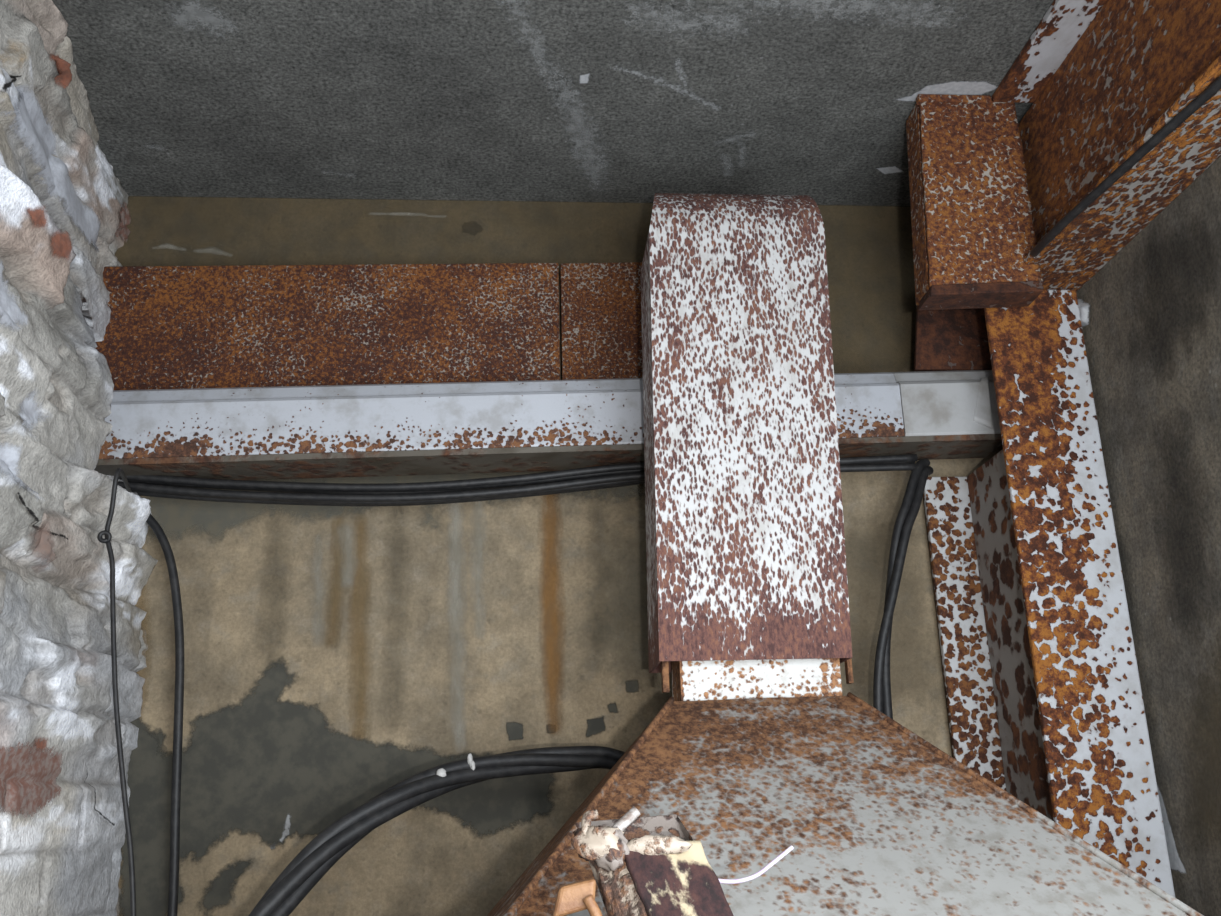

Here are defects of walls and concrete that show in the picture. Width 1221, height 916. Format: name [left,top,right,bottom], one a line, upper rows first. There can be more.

damp [506,722,523,740]
damp [118,660,492,916]
damp [414,773,555,837]